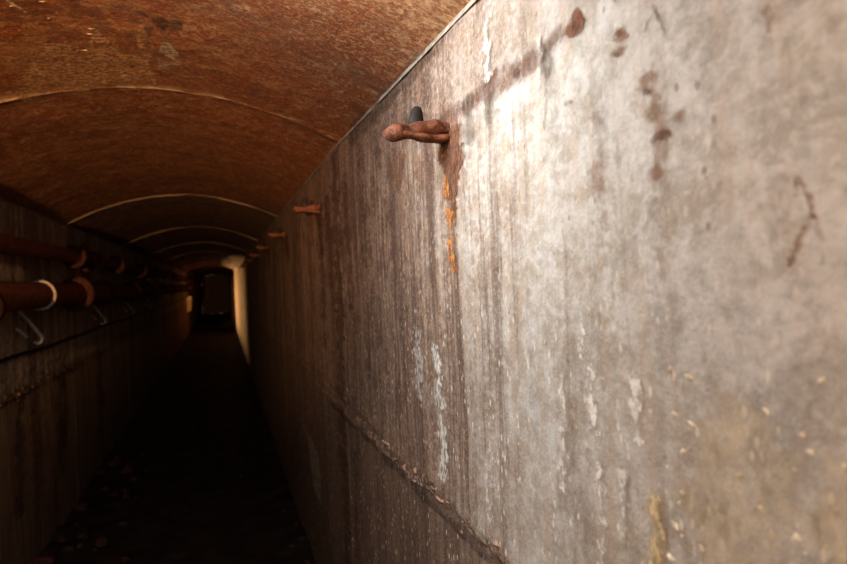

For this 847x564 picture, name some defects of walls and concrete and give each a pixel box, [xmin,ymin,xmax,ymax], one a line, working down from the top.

rust [438,124,463,273]
efflorescence [431,344,449,482]